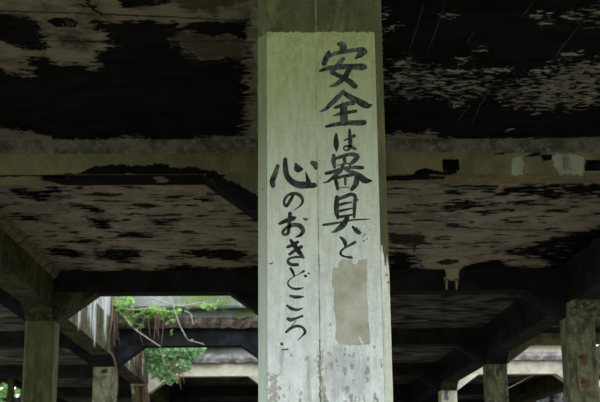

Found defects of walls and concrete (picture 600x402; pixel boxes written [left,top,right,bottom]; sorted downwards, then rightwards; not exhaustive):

water stain [167,0,238,17]
peeling [329,259,375,357]
peeling [268,373,285,402]
peeling [317,352,354,402]